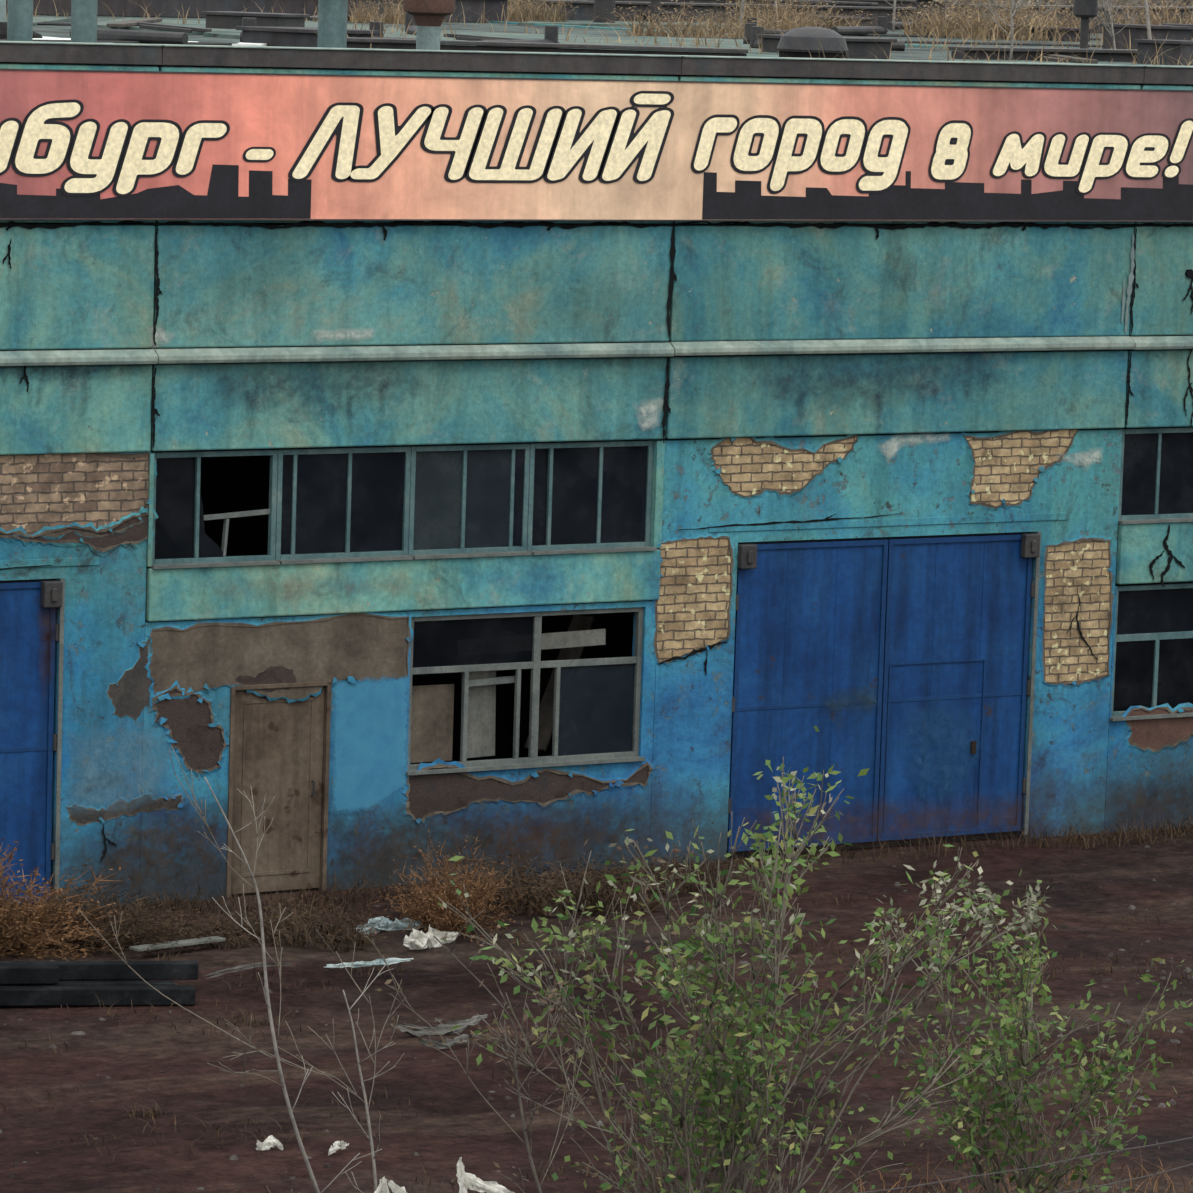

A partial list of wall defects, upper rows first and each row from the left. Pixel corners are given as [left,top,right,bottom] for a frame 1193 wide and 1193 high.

crack [0,220,1193,448]
flaking render [0,451,159,557]
flaking render [650,532,736,667]
flaking render [707,434,858,500]
flaking render [962,429,1079,512]
flaking render [1038,534,1116,689]
crack [1149,524,1185,588]
peeling [105,612,414,778]
spalling [1122,703,1193,755]
spalling [400,757,656,826]